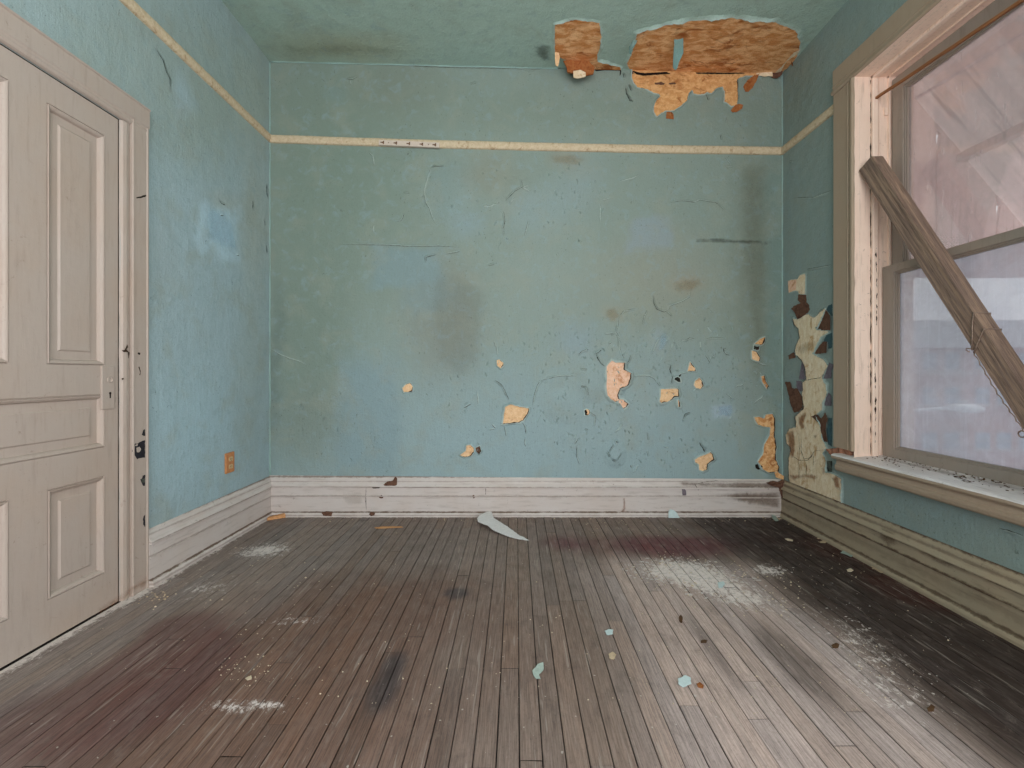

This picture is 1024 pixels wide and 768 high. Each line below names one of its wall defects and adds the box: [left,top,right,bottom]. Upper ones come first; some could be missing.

flaking render [615,70,759,116]
flaking render [495,311,770,474]
flaking render [435,434,485,459]
spalling [825,448,854,461]